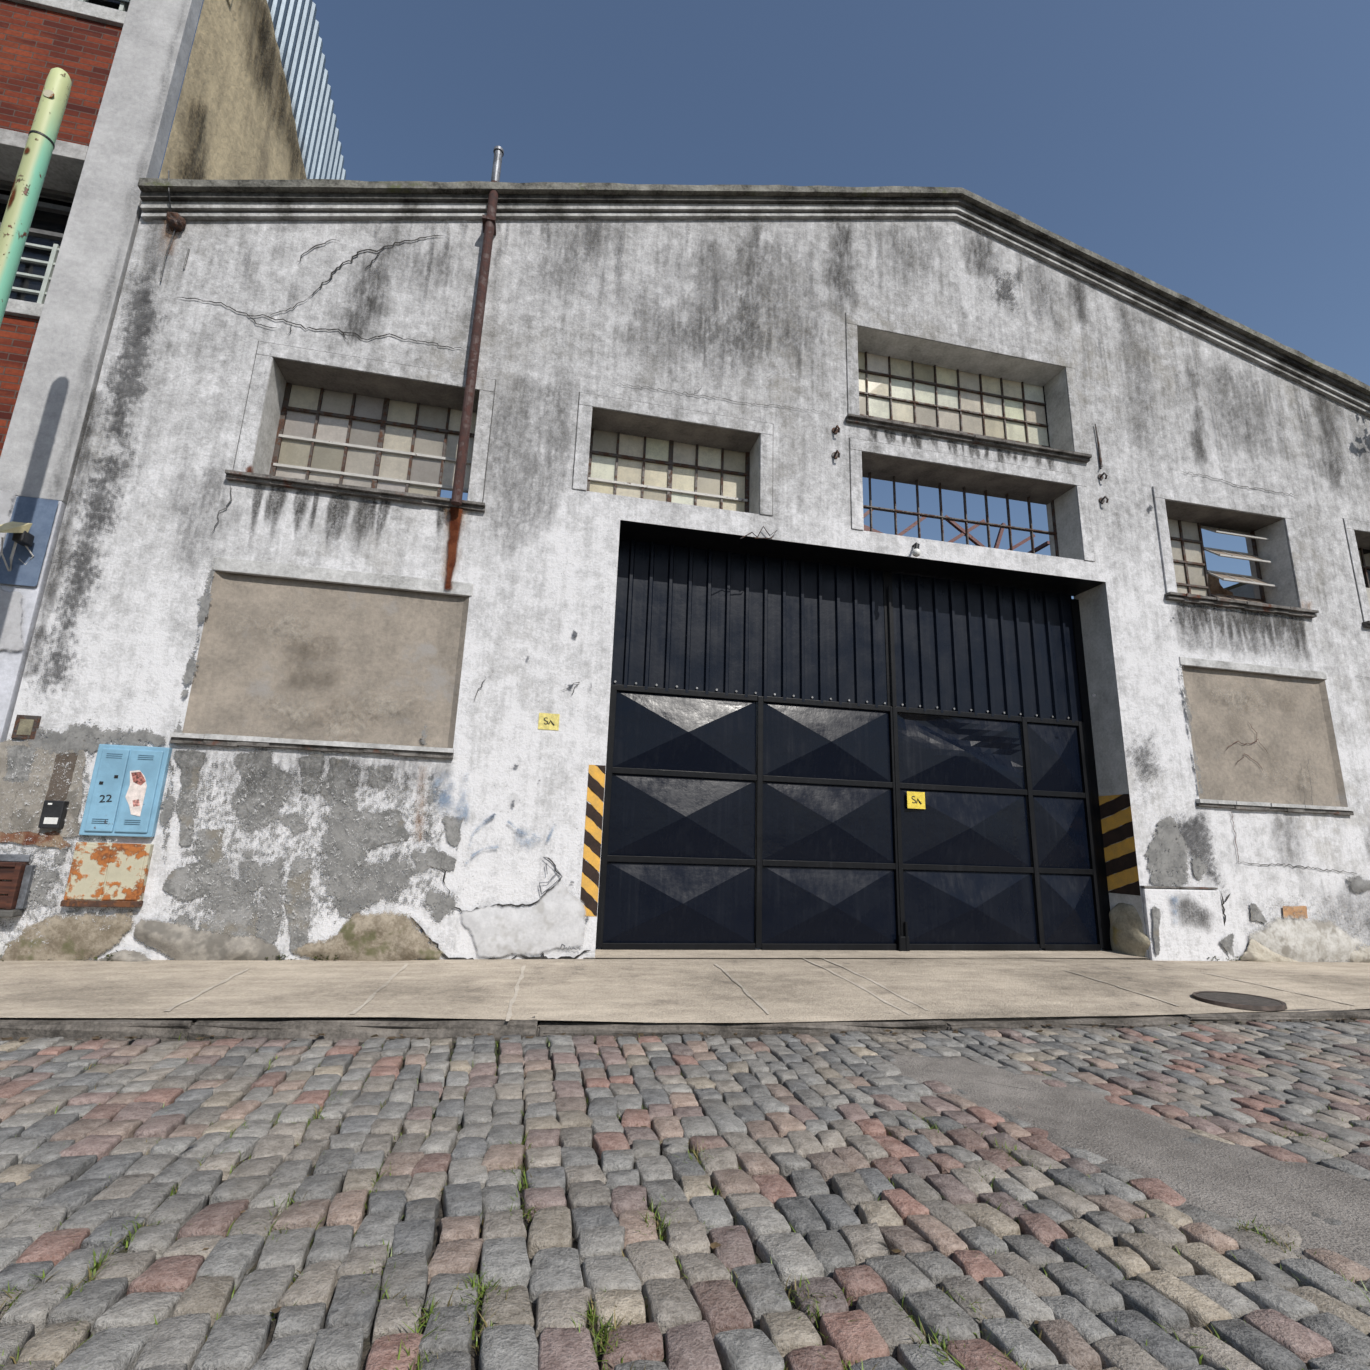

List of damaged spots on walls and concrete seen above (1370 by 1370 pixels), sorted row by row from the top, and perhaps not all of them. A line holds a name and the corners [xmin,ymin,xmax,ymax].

crack [179,235,463,349]
water stain [967,242,1022,316]
water stain [27,261,168,698]
water stain [252,485,390,537]
corrosion [445,507,463,590]
peeling [180,556,216,698]
water stain [1177,602,1305,645]
peeling [0,719,464,961]
crack [410,917,590,960]
crack [441,857,561,912]
peeling [1144,816,1208,887]
spalling [1220,874,1370,958]